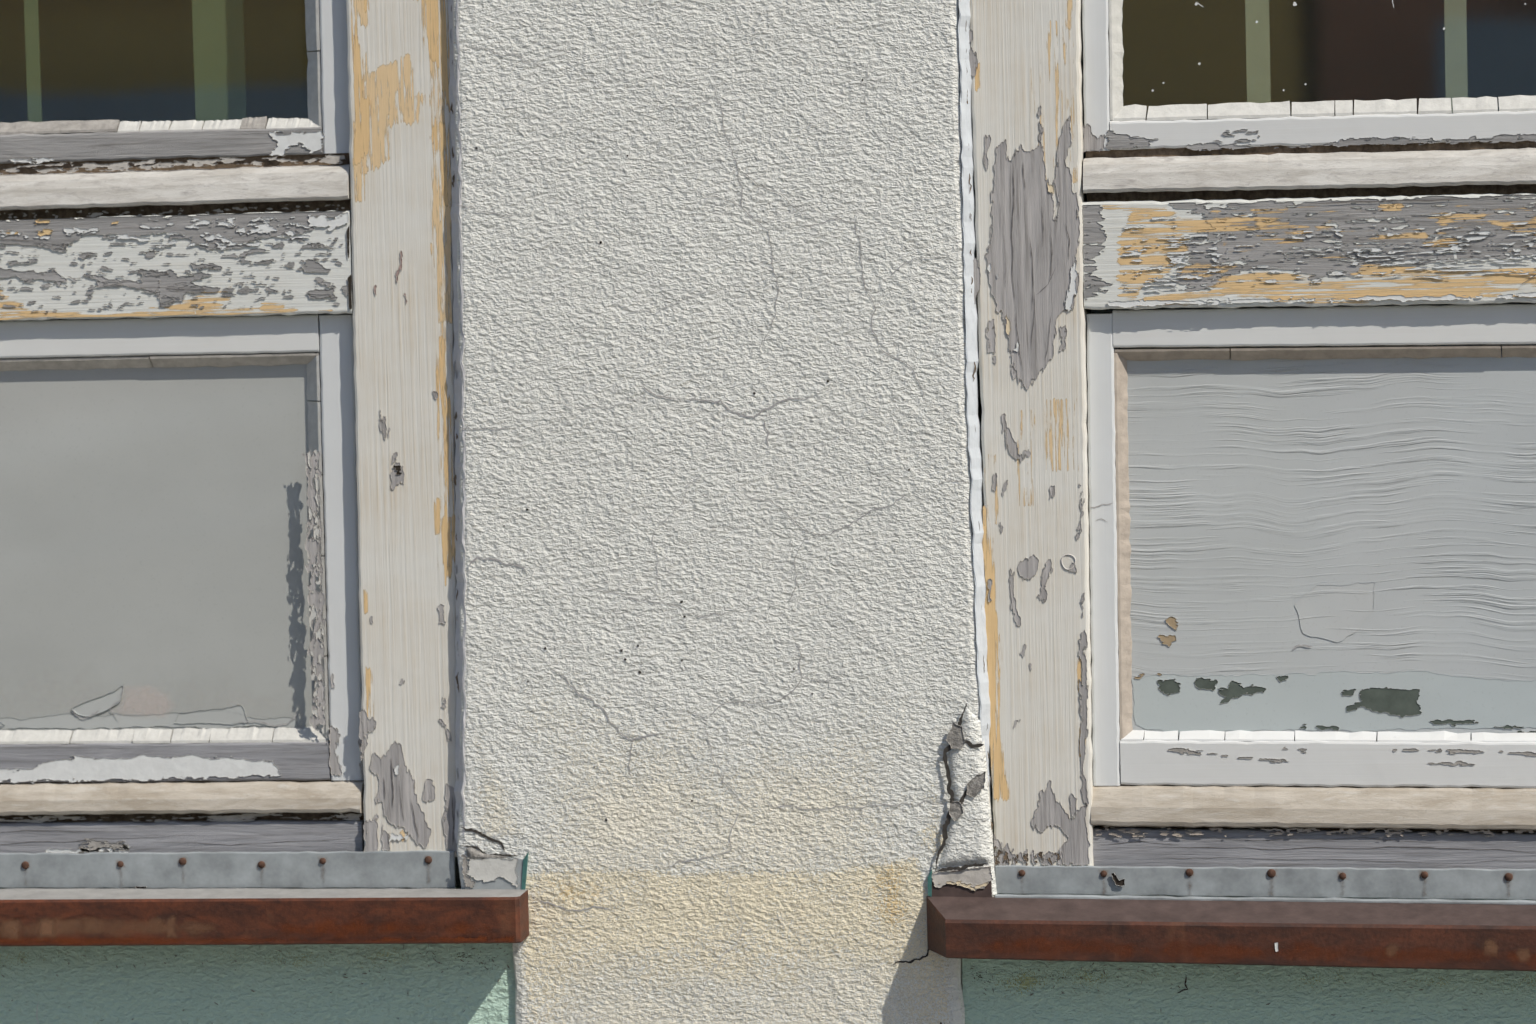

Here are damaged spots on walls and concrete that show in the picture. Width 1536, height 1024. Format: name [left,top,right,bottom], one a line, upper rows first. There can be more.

rust [0,918,177,944]
peeling [0,0,456,625]
peeling [0,449,519,888]
crack [456,768,517,857]
crack [454,360,529,690]
crack [551,382,817,447]
crack [534,464,993,1008]
crack [674,73,976,432]
peeling [969,29,980,91]
peeling [949,398,1085,821]
peeling [973,0,1536,390]
peeling [1132,671,1536,766]